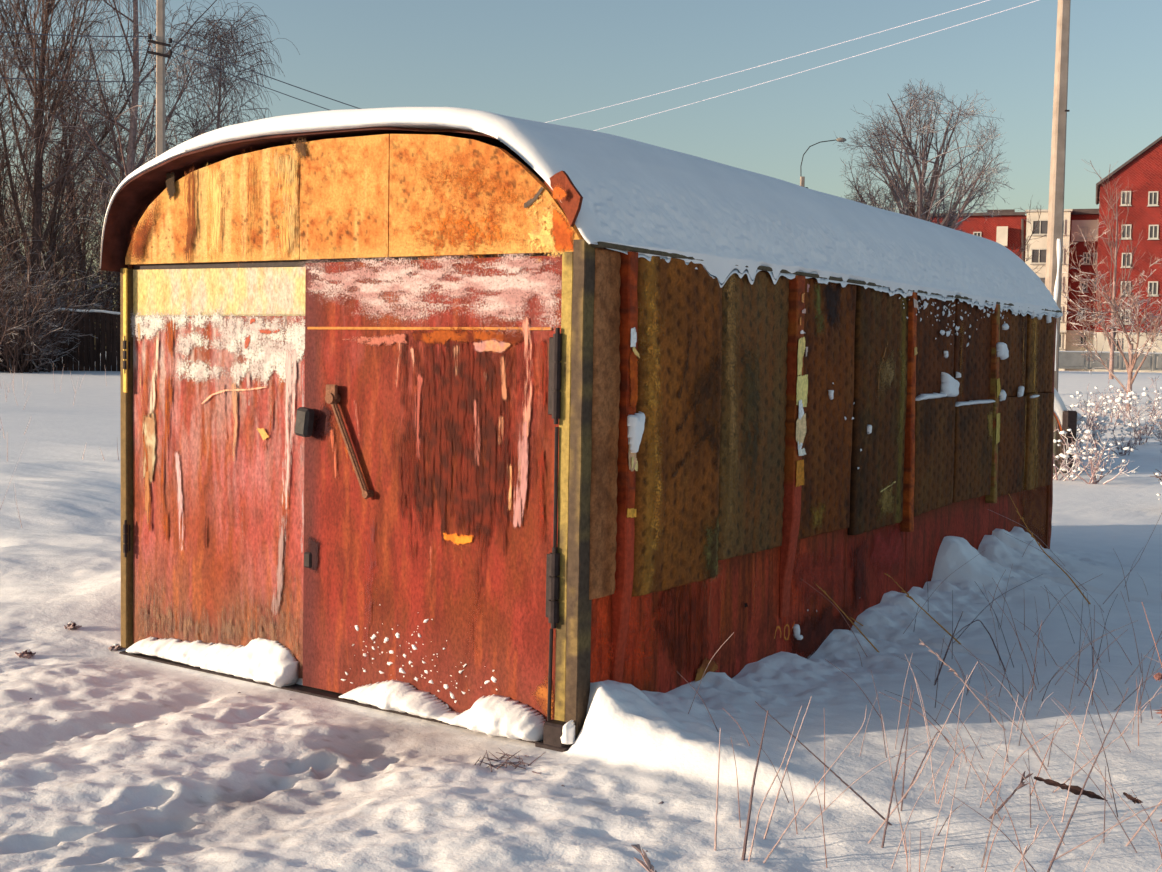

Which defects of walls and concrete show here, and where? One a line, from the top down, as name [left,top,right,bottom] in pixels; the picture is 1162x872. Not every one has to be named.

corrosion [184,167,199,259]
corrosion [551,185,573,253]
corrosion [143,319,176,541]
peeling [130,309,305,615]
corrosion [244,318,280,349]
peeling [304,199,563,527]
corrosion [392,324,548,557]
peeling [628,437,638,471]
peeling [630,327,640,358]
peeling [796,284,810,487]
corrosion [791,602,851,658]
corrosion [533,677,555,717]